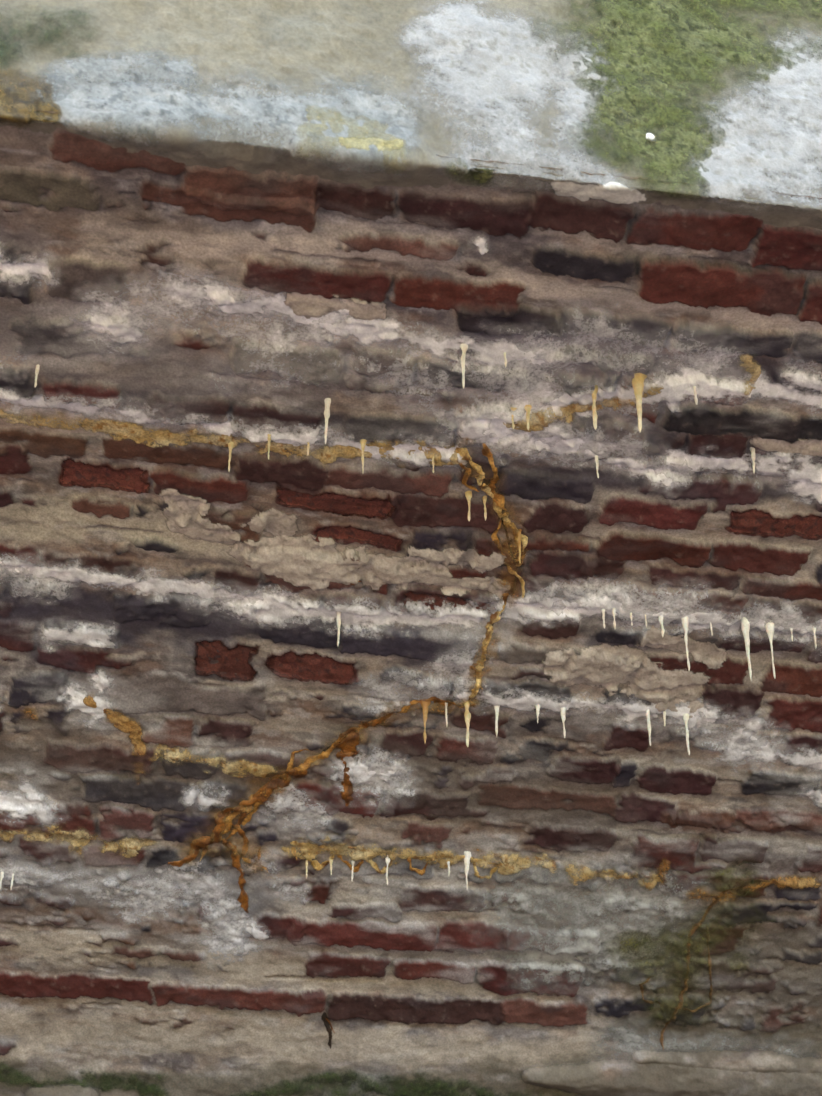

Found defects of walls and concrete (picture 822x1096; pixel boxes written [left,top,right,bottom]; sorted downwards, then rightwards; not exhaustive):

water stain [0,255,57,284]
water stain [475,238,488,255]
water stain [0,270,822,504]
crack [168,443,528,913]
water stain [0,557,822,771]
water stain [265,784,331,830]
water stain [330,752,411,801]
water stain [799,788,822,806]
water stain [0,861,269,956]
water stain [474,865,713,989]
water stain [594,1026,739,1059]